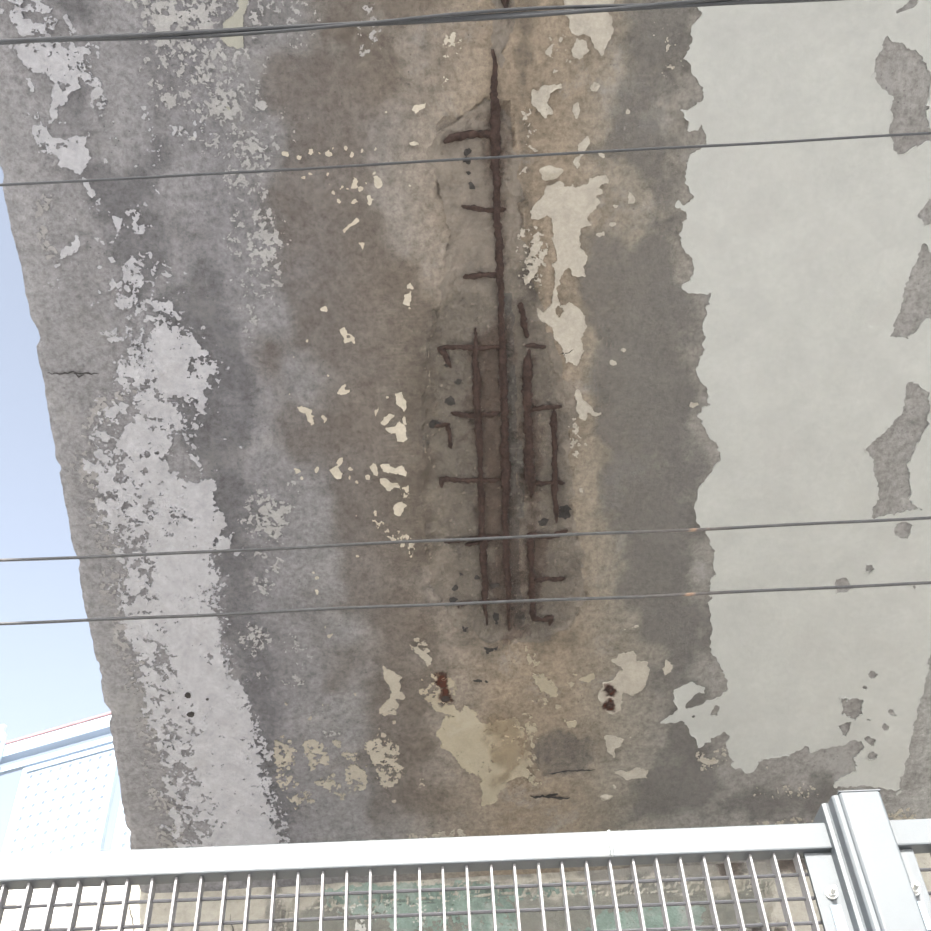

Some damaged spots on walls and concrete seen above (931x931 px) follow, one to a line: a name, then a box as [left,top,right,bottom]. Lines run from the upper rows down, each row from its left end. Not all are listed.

peeling [0,0,152,245]
leakage [125,0,321,346]
leakage [609,0,686,193]
crack [48,370,98,378]
peeling [70,251,415,849]
leakage [237,483,295,596]
spalling [409,0,616,806]
leakage [582,236,711,686]
peeling [660,0,931,795]
corrosion [435,672,453,704]
peeling [567,651,650,715]
leakage [632,694,716,819]